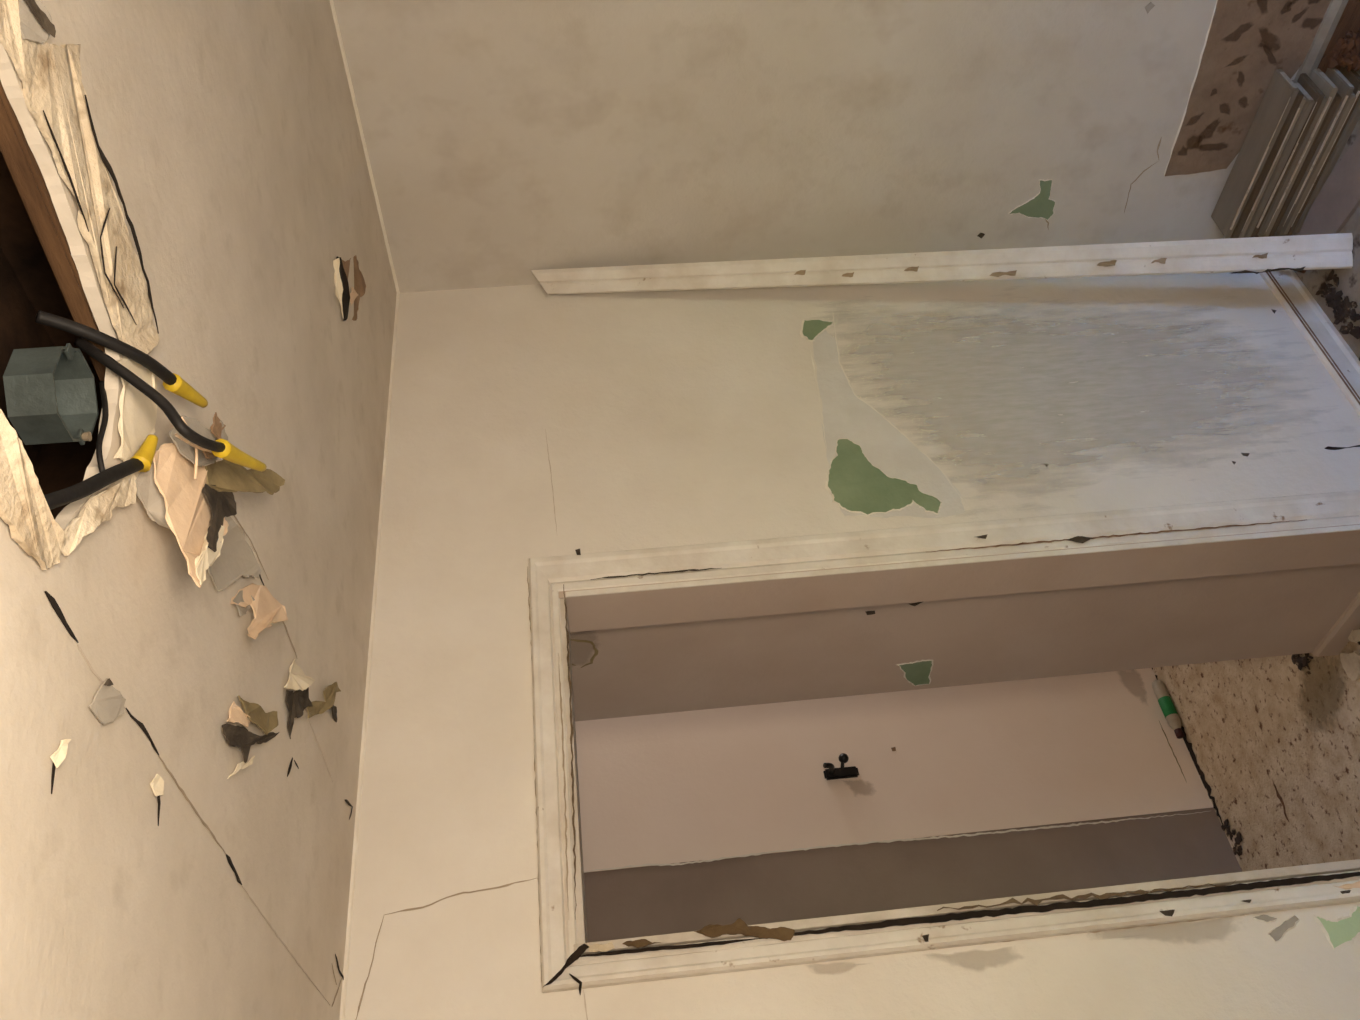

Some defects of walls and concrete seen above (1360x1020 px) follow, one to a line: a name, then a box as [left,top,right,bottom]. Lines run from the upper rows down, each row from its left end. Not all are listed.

peeling [1008,179,1056,230]
peeling [333,255,366,321]
peeling [800,312,965,518]
peeling [135,412,288,639]
crack [233,515,269,586]
crack [45,591,104,683]
spalling [896,659,933,686]
peeling [222,659,341,779]
crack [50,739,71,794]
crack [124,567,577,1019]
peeling [1242,881,1360,950]